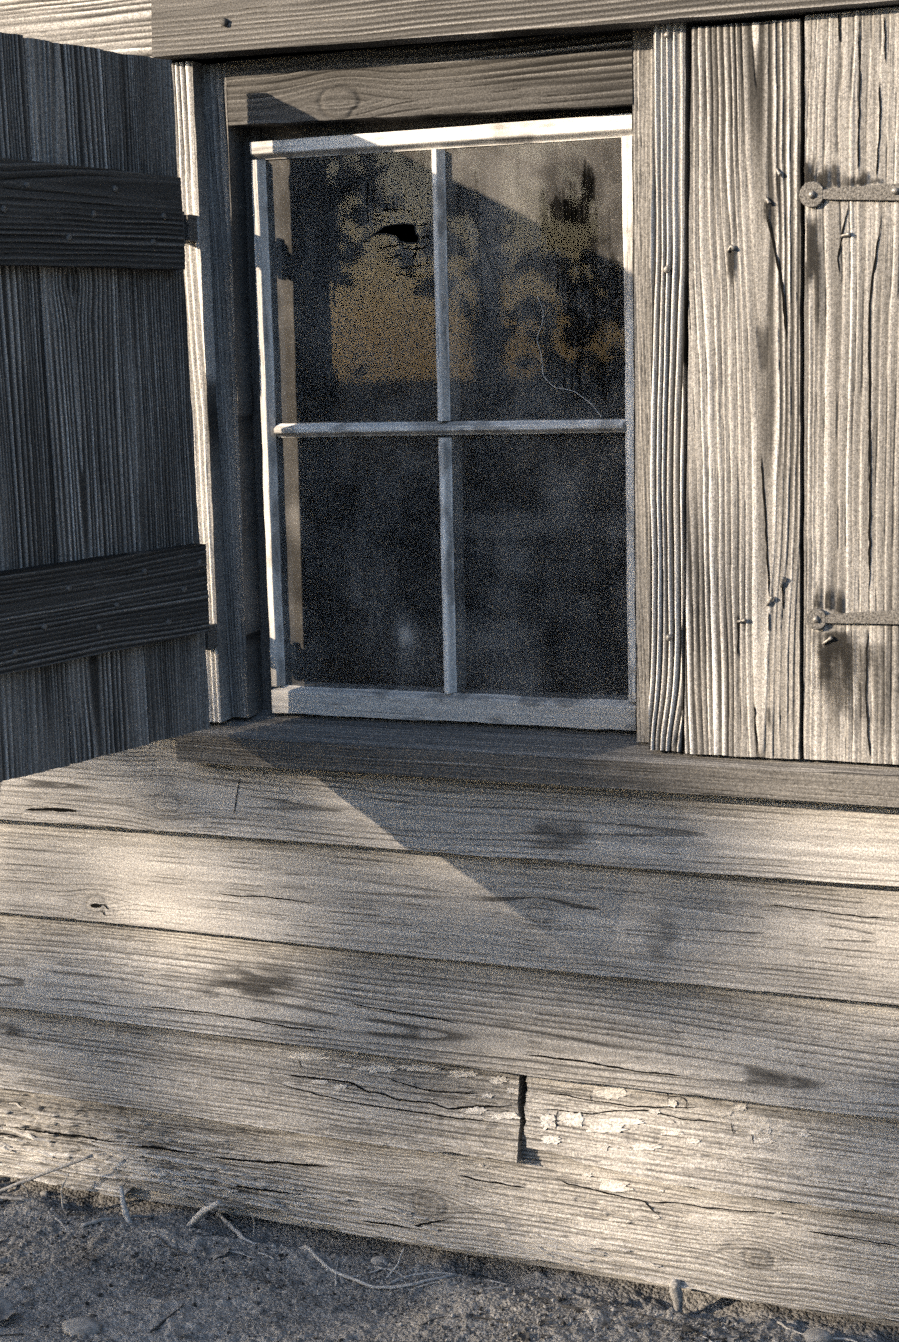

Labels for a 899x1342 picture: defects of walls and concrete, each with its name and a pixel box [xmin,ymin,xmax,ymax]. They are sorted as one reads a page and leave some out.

crack [537,296,601,416]
crack [138,1002,460,1033]
crack [272,1054,754,1143]
crack [0,1127,327,1199]
crack [457,1175,526,1188]
crack [366,1219,447,1229]